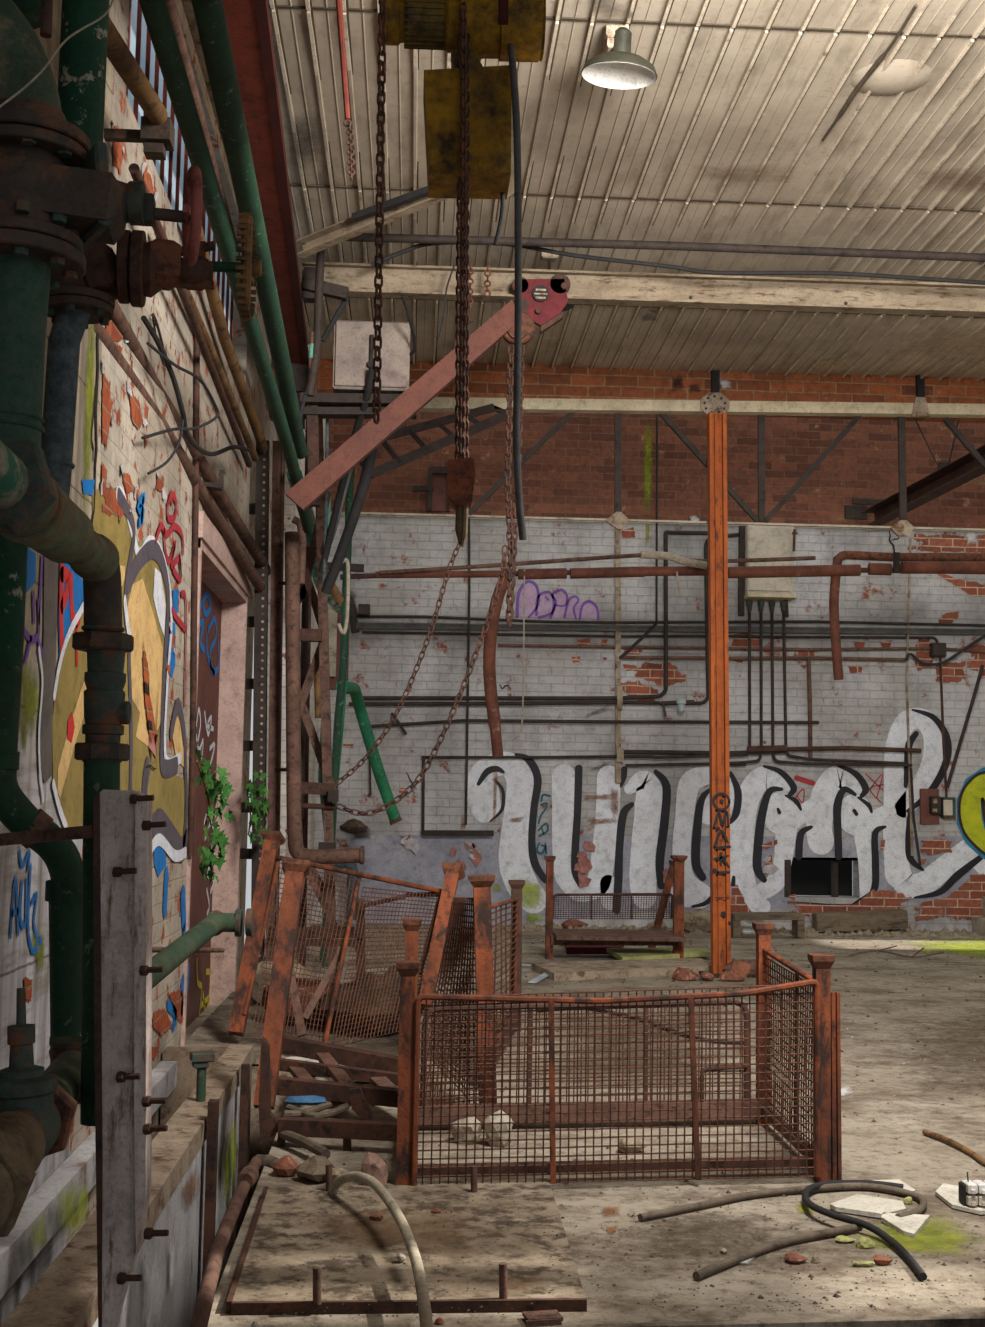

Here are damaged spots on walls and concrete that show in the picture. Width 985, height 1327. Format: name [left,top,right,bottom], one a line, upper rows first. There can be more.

peeling [621,527,635,539]
peeling [907,533,985,553]
peeling [938,574,985,597]
peeling [938,611,960,623]
peeling [915,639,985,683]
peeling [621,649,686,701]
peeling [787,874,985,921]